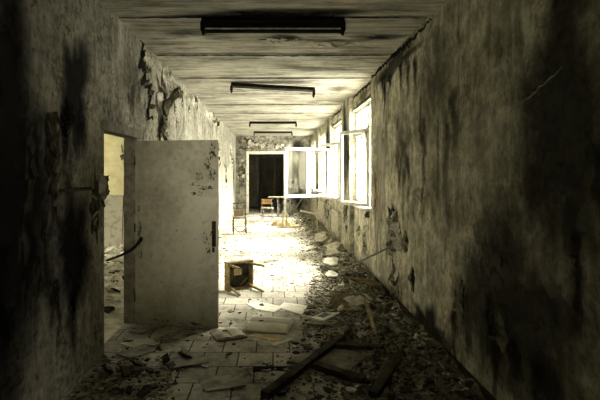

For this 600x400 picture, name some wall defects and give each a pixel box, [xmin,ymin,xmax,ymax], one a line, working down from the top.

leakage [60,100,74,160]
flaking render [144,51,285,196]
leakage [377,44,417,104]
leakage [427,49,458,171]
flaking render [385,204,409,253]
leakage [396,138,425,210]
leakage [462,0,600,400]
leakage [414,306,446,347]